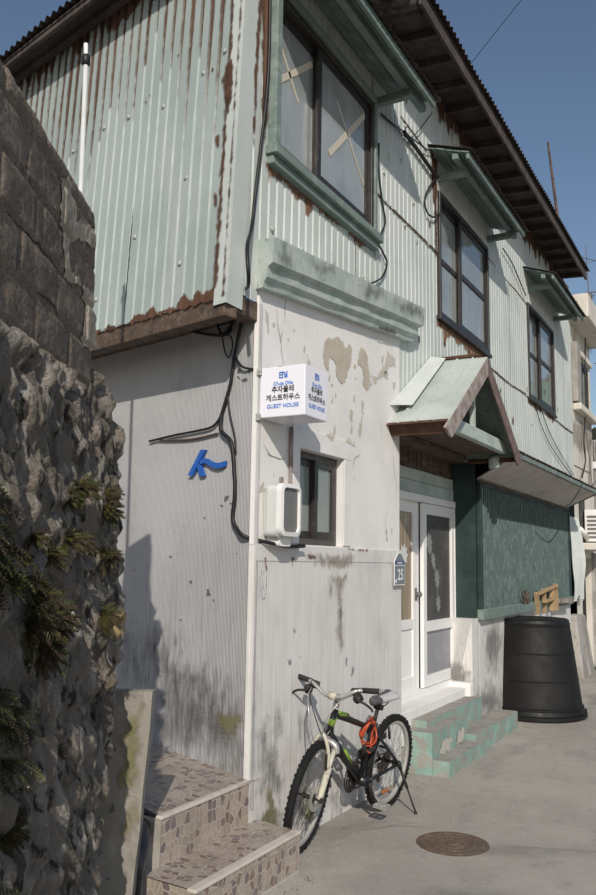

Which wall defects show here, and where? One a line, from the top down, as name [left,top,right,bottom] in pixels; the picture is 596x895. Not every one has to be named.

corrosion [253,0,269,143]
corrosion [17,0,242,334]
corrosion [266,164,365,247]
corrosion [429,152,438,254]
corrosion [436,94,569,290]
peeling [317,334,396,403]
corrosion [437,320,485,358]
peeling [325,395,364,445]